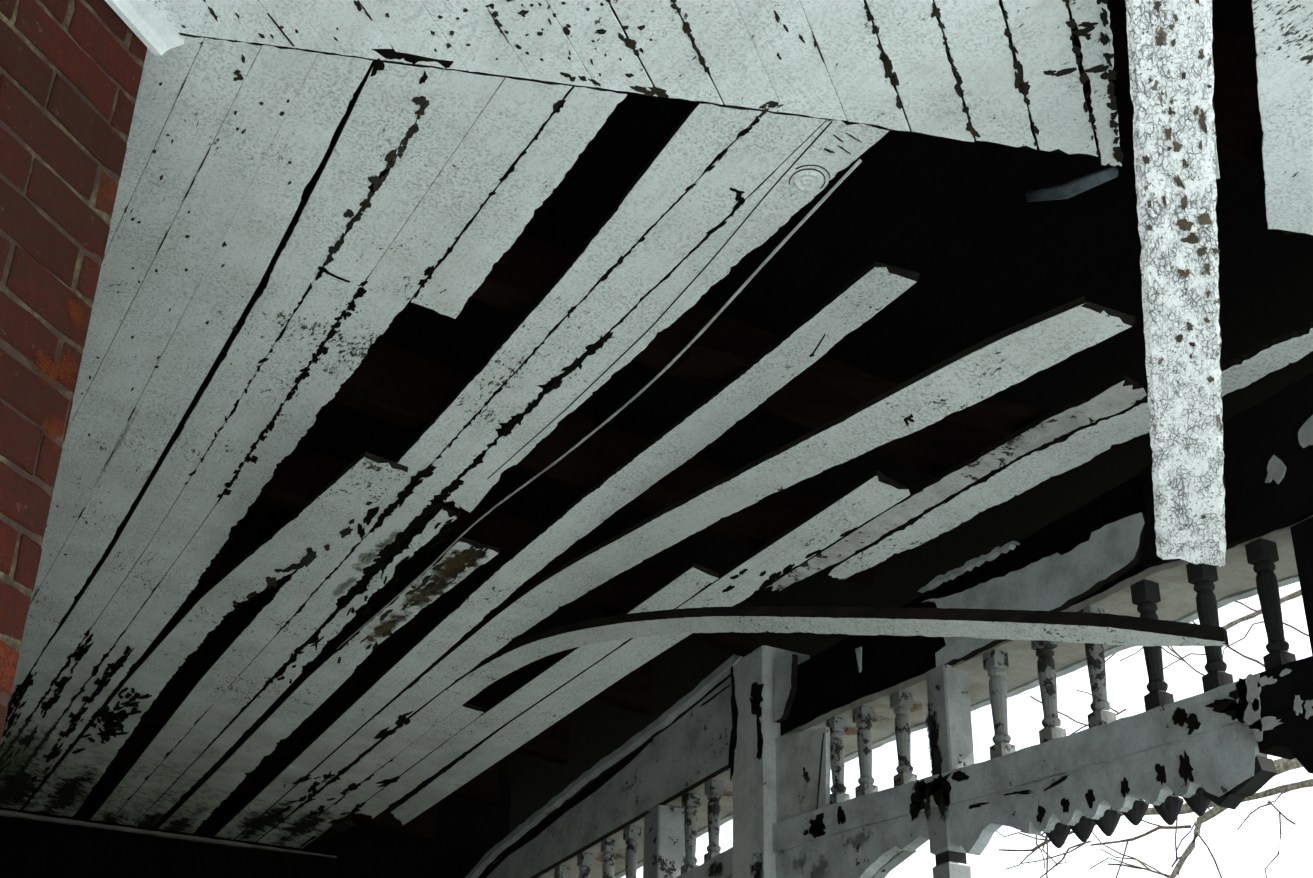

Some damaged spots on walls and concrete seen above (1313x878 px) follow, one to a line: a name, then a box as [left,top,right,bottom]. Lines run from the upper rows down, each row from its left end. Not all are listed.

peeling [323,96,430,266]
peeling [706,187,745,235]
peeling [685,101,779,191]
peeling [1004,10,1039,146]
peeling [1044,0,1124,163]
peeling [1147,99,1220,299]
peeling [502,331,613,437]
peeling [233,329,554,606]
peeling [340,479,488,650]
water stain [0,711,97,817]
peeling [728,666,764,781]
peeling [1172,668,1292,742]